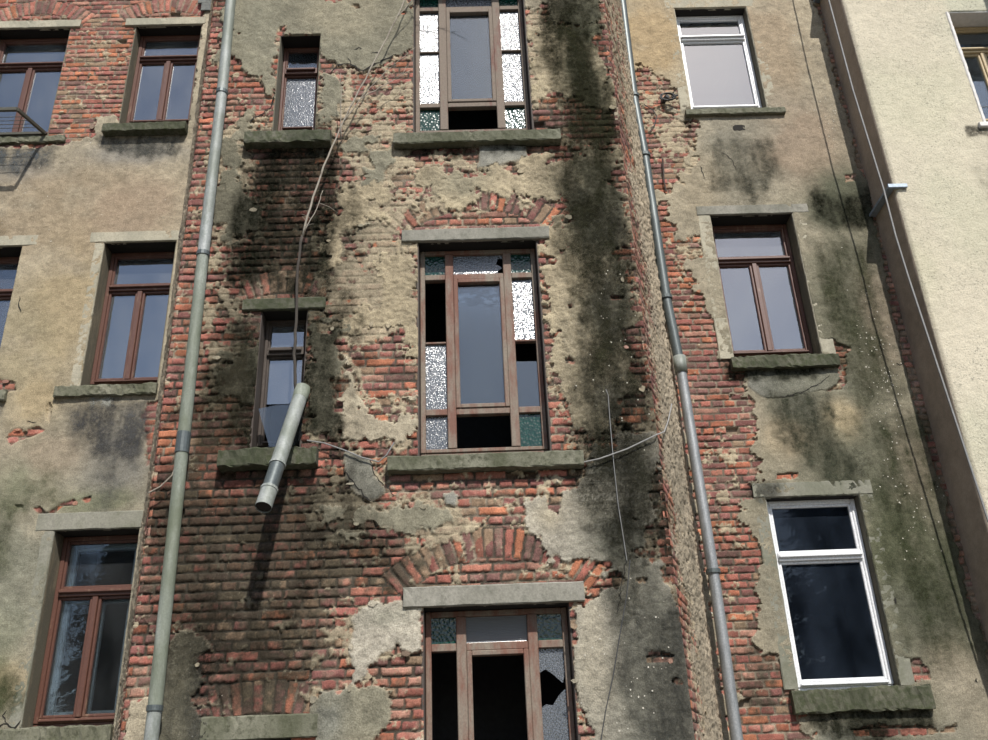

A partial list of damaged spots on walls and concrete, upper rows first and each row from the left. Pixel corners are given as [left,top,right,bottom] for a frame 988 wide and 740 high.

peeling [0,0,424,740]
damp [206,319,259,449]
damp [229,148,356,452]
peeling [315,451,460,540]
damp [540,0,672,569]
peeling [411,0,818,740]
spalling [812,0,868,187]
damp [811,190,872,229]
spalling [827,202,988,659]